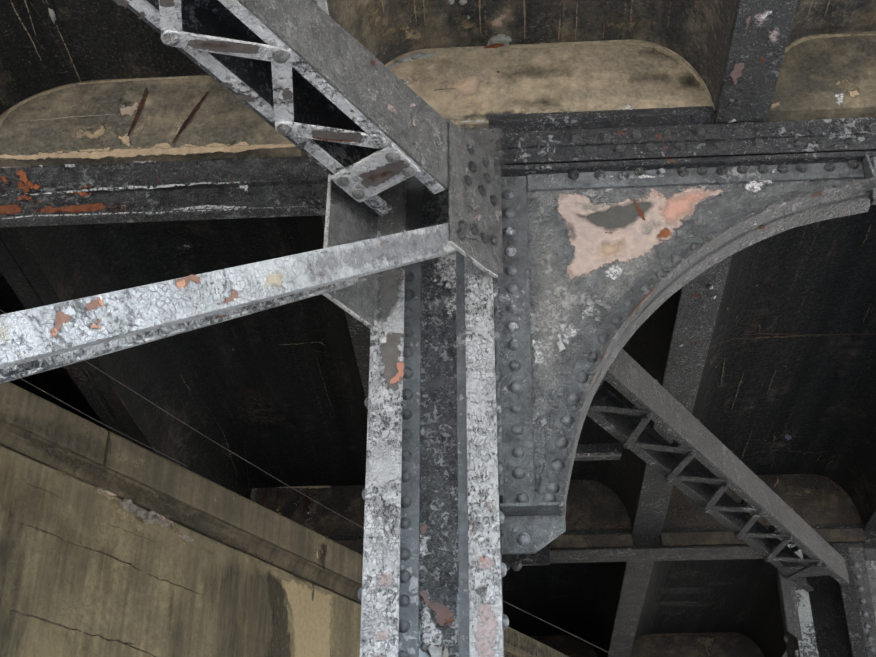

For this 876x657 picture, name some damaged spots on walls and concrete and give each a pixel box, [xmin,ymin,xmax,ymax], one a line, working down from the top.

peeling [366,4,439,70]
peeling [746,10,779,43]
peeling [730,56,748,86]
rust [0,169,127,215]
peeling [745,169,776,192]
peeling [532,175,724,366]
crack [21,523,199,594]
spalling [88,485,194,546]
peeling [419,523,429,569]
crack [15,611,156,657]
peeling [419,587,459,657]
peeling [475,586,497,657]